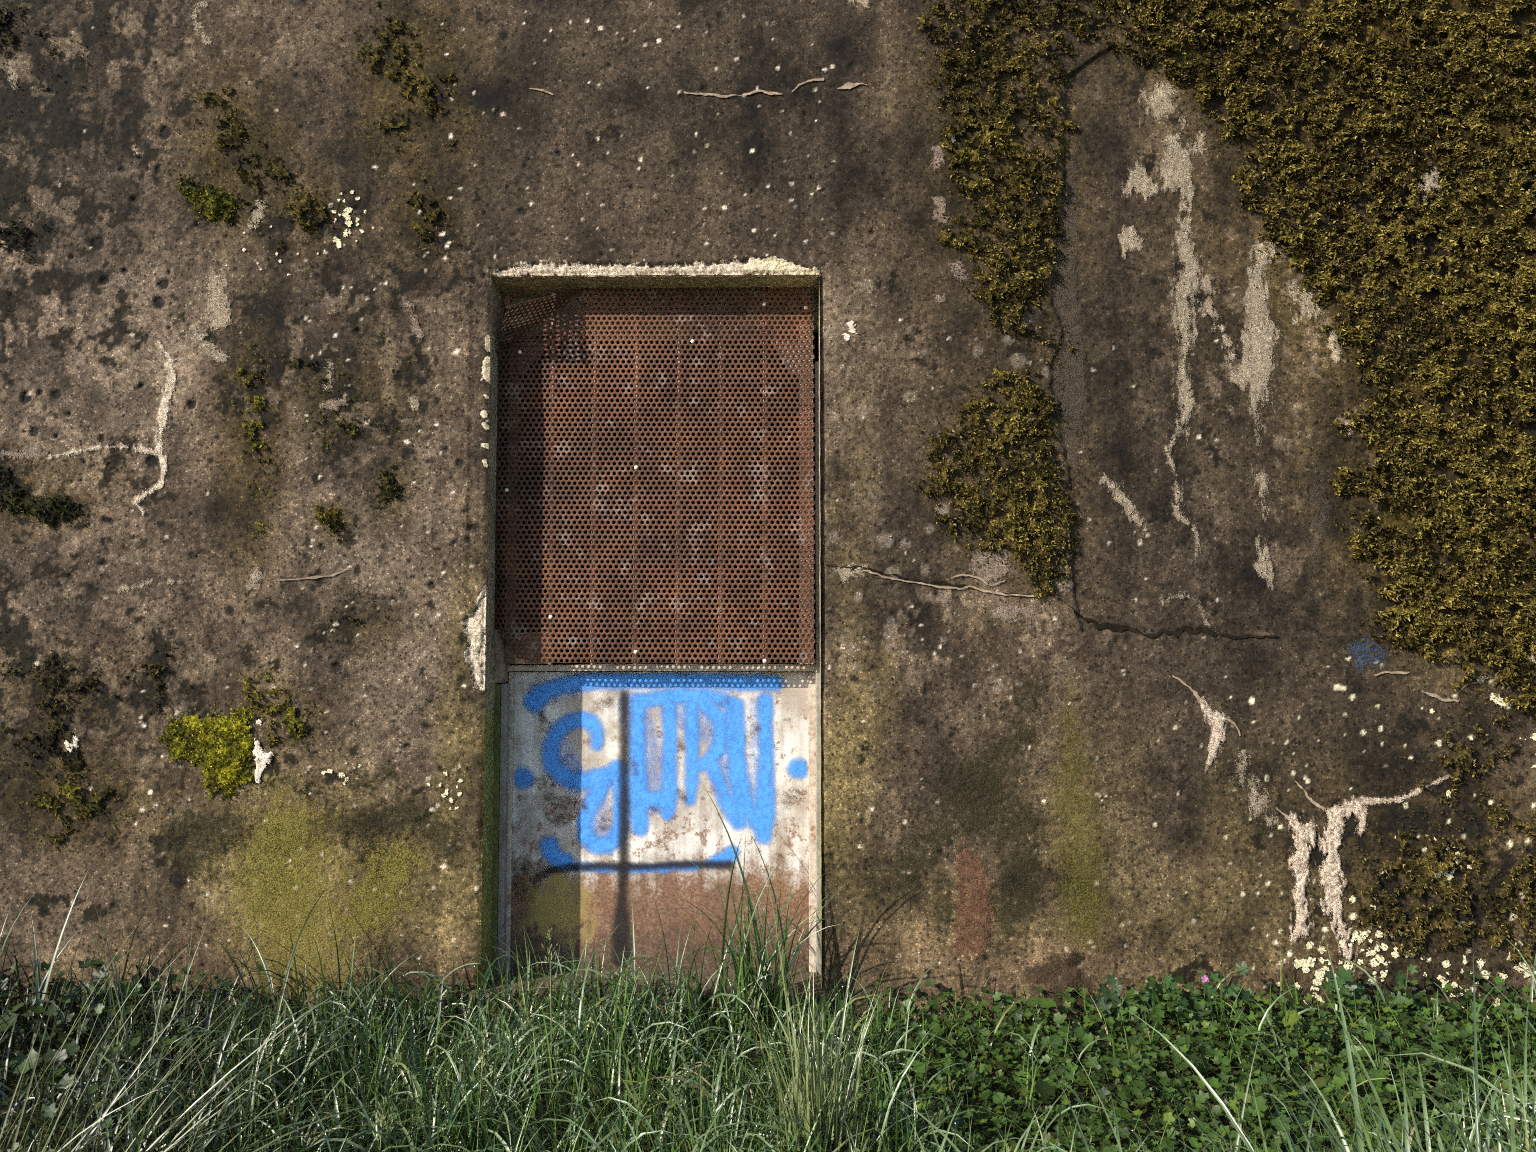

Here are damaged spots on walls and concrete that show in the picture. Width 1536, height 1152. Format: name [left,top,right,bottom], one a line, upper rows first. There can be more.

damp [1118,80,1324,590]
crack [48,340,176,516]
crack [826,437,1279,639]
damp [1098,472,1148,534]
crack [1172,675,1241,773]
damp [1229,747,1280,832]